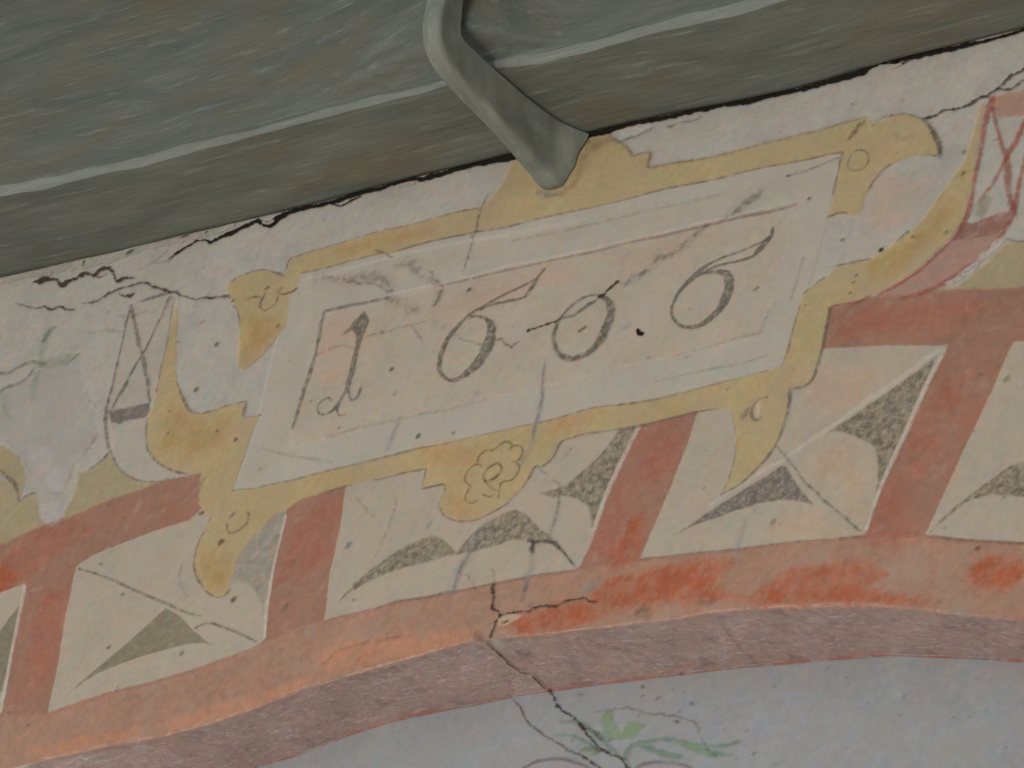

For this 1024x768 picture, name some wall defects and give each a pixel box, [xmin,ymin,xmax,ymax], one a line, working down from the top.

crack [588,28,1024,138]
crack [33,266,229,310]
crack [487,584,630,768]